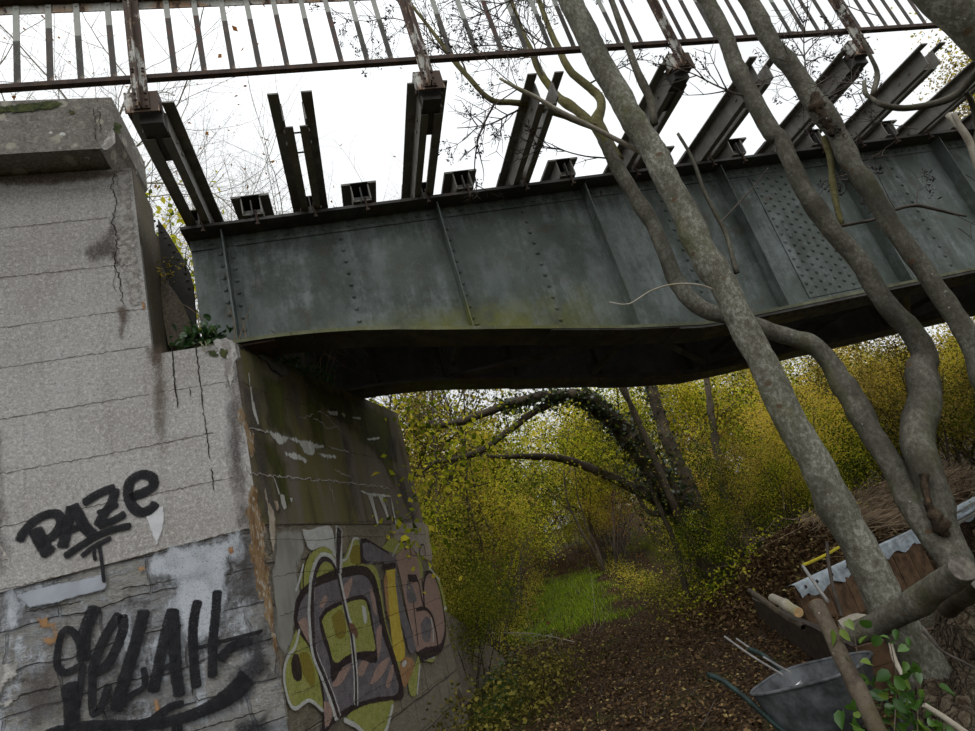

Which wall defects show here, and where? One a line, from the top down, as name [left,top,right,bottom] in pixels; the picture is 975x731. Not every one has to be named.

water stain [0,169,126,185]
crack [110,174,124,304]
crack [171,348,214,489]
spalling [237,405,255,457]
water stain [229,373,414,525]
spalling [245,483,279,662]